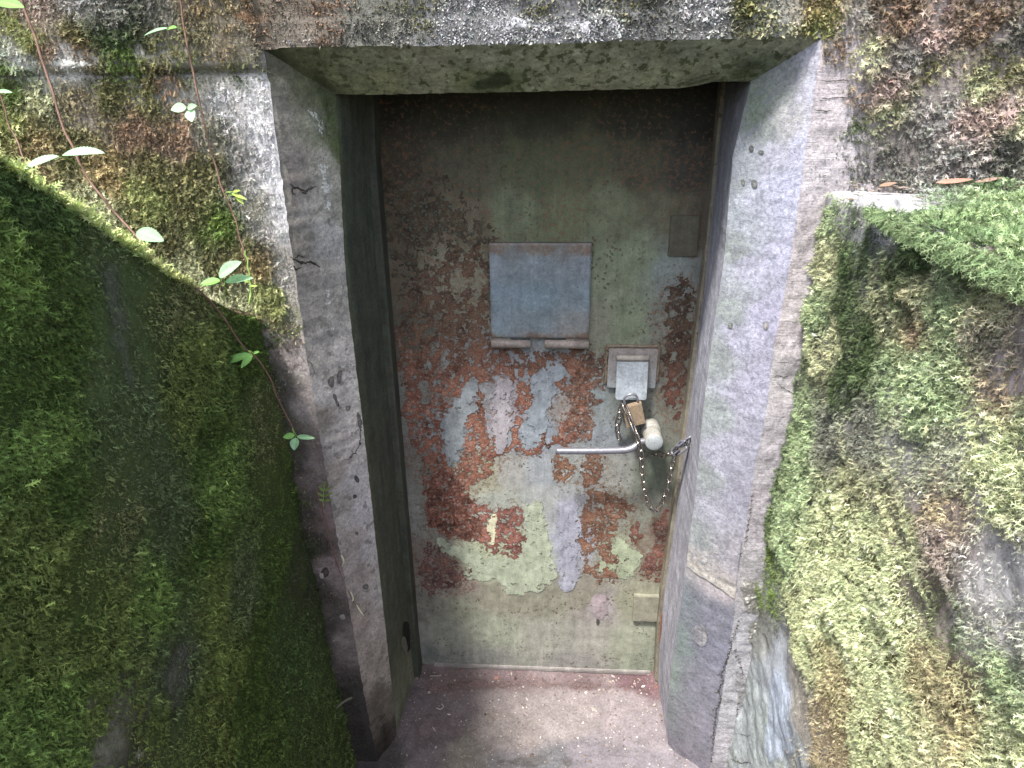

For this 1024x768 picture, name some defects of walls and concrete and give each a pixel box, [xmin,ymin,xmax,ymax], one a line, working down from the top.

crack [291,184,317,194]
crack [290,255,320,271]
peeling [438,360,567,468]
corrosion [382,157,670,596]
corrosion [659,274,697,420]
peeling [436,498,582,596]
peeling [598,537,643,579]